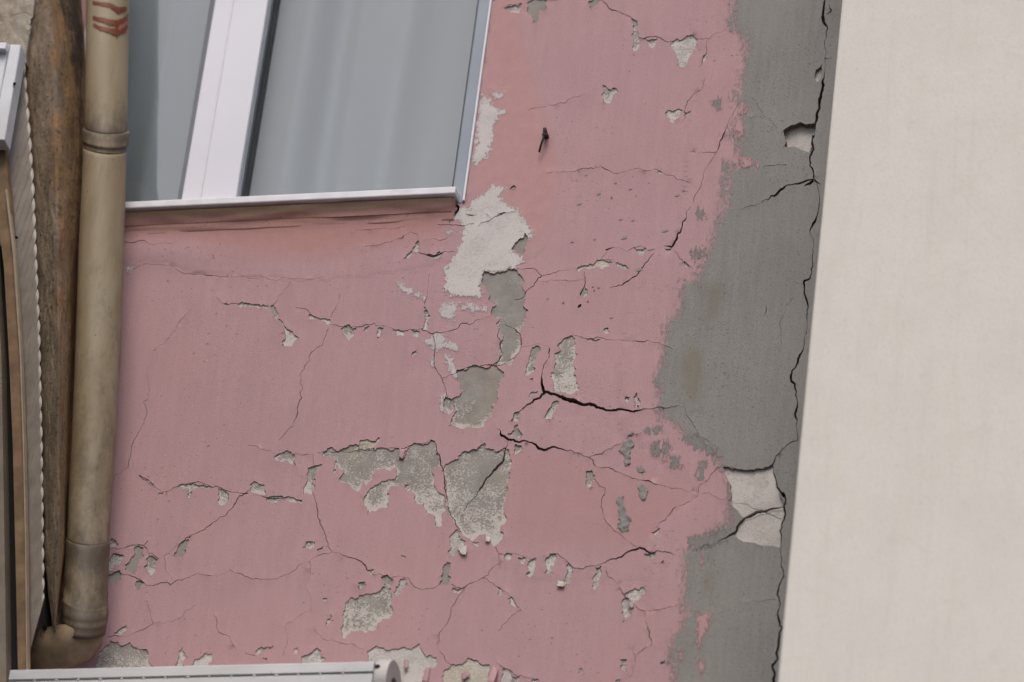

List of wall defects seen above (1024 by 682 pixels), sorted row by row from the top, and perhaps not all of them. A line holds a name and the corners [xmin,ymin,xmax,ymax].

peeling [670,35,707,67]
crack [809,82,825,226]
peeling [512,234,528,254]
crack [542,351,605,411]
peeling [545,317,613,419]
peeling [250,269,573,594]
crack [436,445,467,539]
flaking render [724,466,785,547]
peeling [109,539,157,590]
peeling [326,570,407,638]
crack [737,467,786,682]
peeling [367,644,519,682]